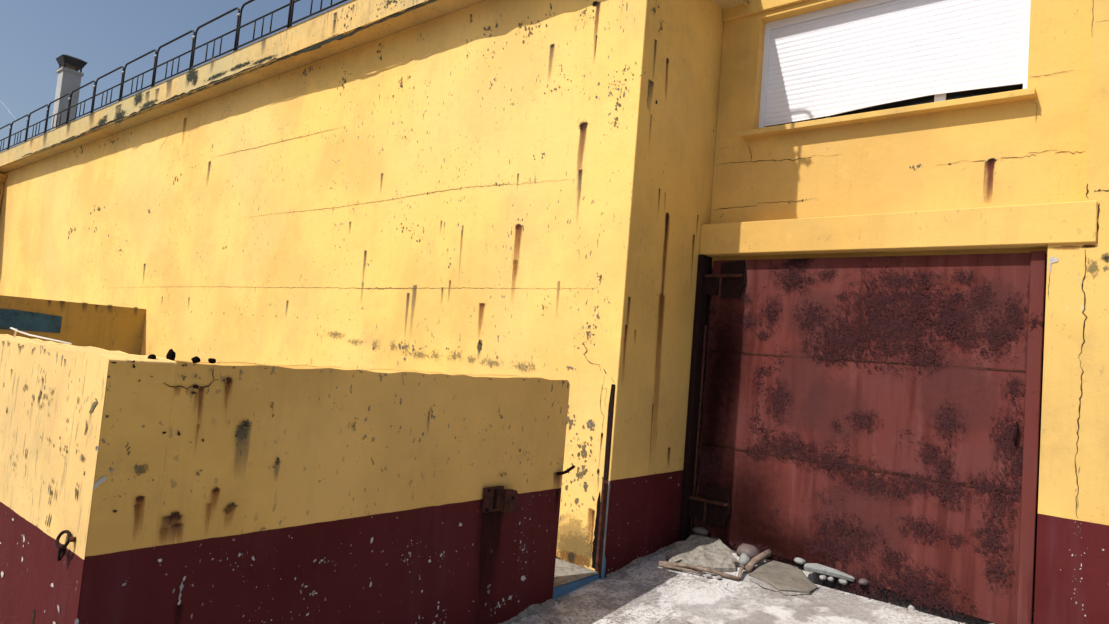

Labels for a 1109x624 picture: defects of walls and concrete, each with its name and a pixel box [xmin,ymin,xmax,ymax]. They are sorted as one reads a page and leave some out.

corrosion [578,121,588,193]
crack [999,150,1086,159]
corrosion [513,224,522,273]
corrosion [658,188,670,279]
corrosion [657,294,665,347]
crack [1075,184,1109,518]
corrosion [135,496,144,516]
corrosion [161,511,183,535]
peeling [176,576,186,624]